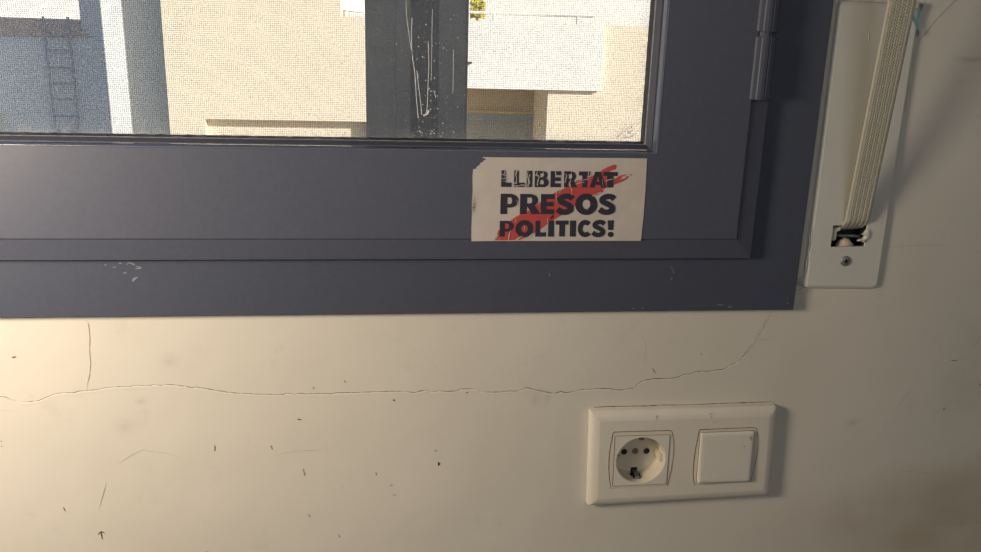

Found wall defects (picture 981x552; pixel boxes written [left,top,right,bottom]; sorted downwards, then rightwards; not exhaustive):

crack [0,310,776,411]